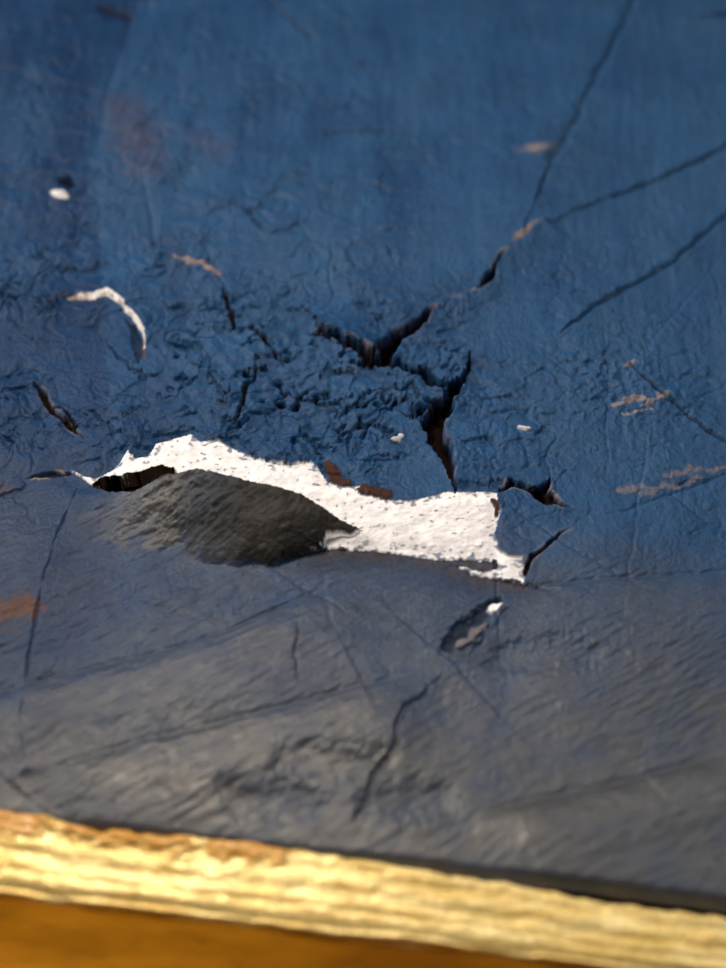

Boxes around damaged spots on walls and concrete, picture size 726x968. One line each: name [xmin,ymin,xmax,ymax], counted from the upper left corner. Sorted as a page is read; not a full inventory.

crack [0,469,81,783]
crack [220,284,286,428]
peeling [71,434,526,585]
crack [351,473,577,823]
crack [308,0,726,494]